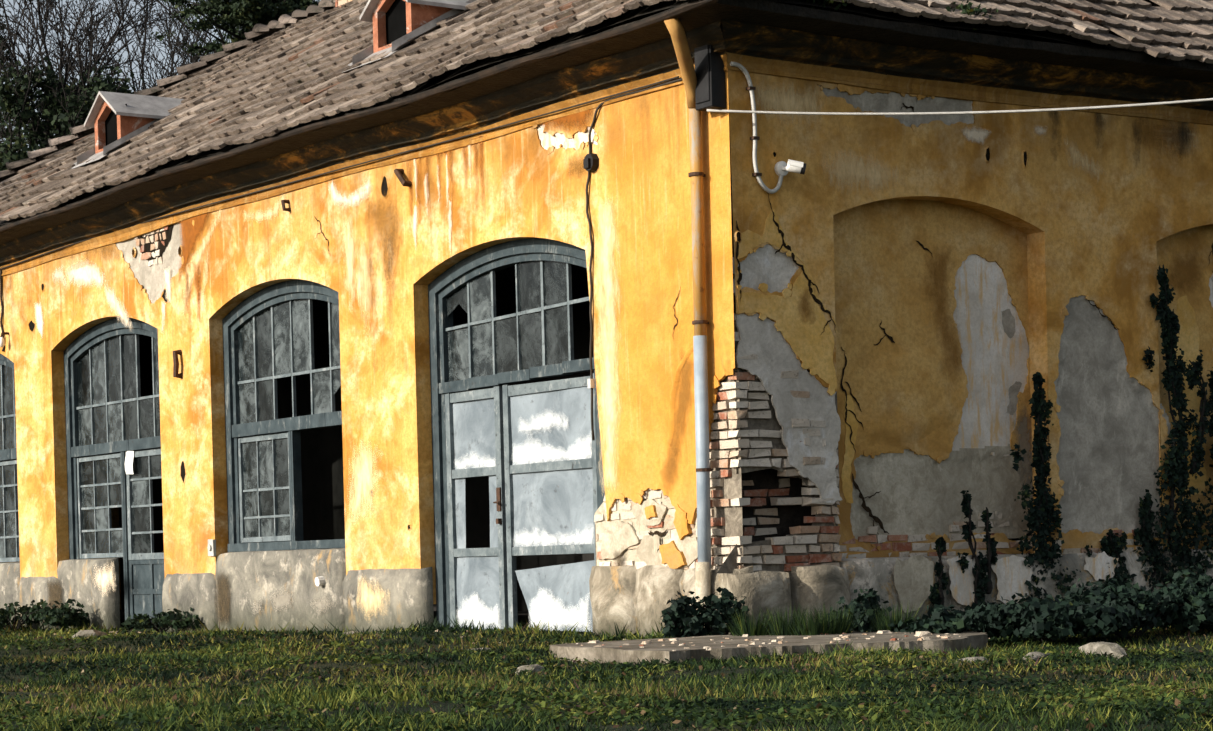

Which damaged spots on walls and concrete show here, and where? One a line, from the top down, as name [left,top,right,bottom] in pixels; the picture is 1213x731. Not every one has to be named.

peeling [818,84,974,131]
water stain [413,159,451,244]
peeling [116,220,195,303]
water stain [345,207,395,312]
crack [735,220,743,299]
crack [767,192,889,535]
crack [874,322,895,345]
flaking render [594,209,1033,613]
peeling [1054,295,1213,581]